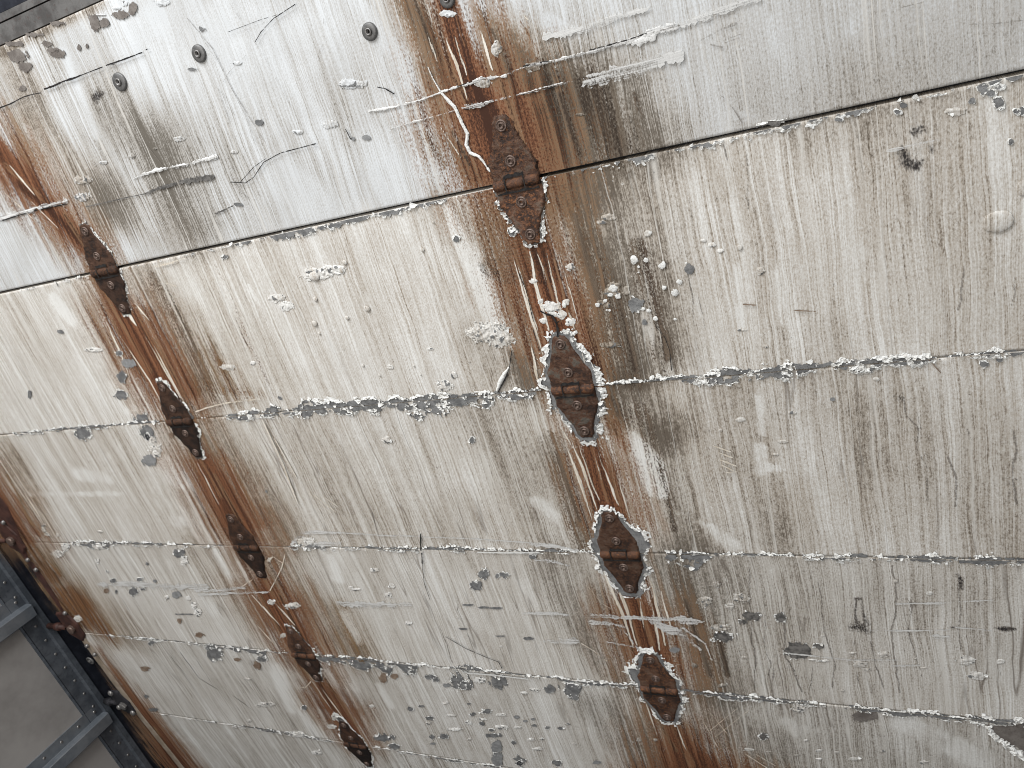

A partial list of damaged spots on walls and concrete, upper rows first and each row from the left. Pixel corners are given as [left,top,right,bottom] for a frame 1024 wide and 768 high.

crack [228,4,295,42]
crack [231,143,316,183]
peeling [581,106,877,173]
peeling [465,176,556,248]
corrosion [399,0,659,544]
peeling [226,299,1024,447]
corrosion [0,108,389,768]
peeling [288,505,654,599]
peeling [664,549,1024,571]
peeling [105,624,830,768]
corrosion [579,564,775,768]
peeling [845,703,1024,727]